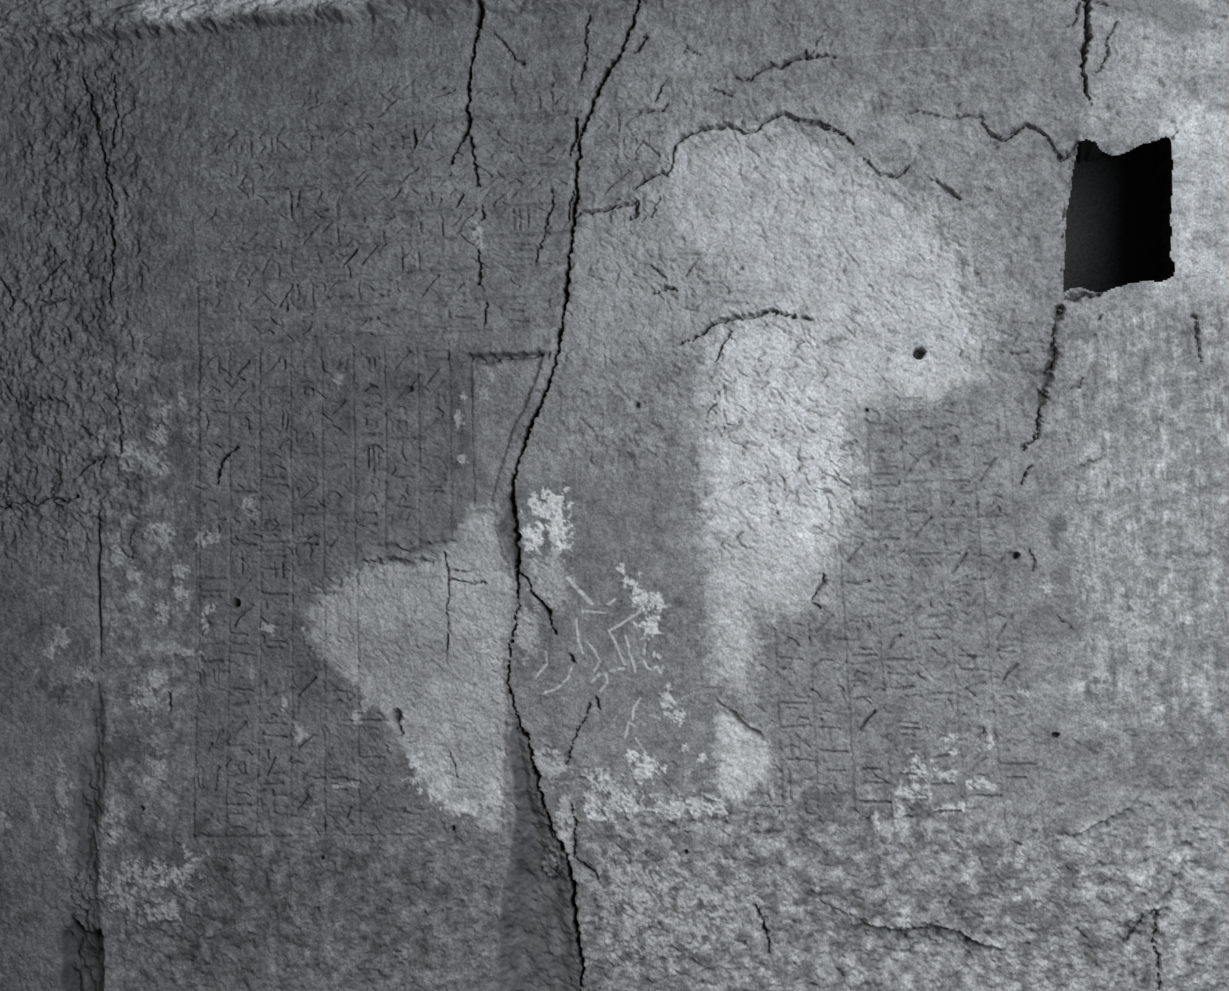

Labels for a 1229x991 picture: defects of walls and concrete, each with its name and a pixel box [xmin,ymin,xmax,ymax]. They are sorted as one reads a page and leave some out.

crack [903,109,1080,162]
crack [1057,0,1120,107]
crack [995,290,1106,487]
crack [443,0,962,991]